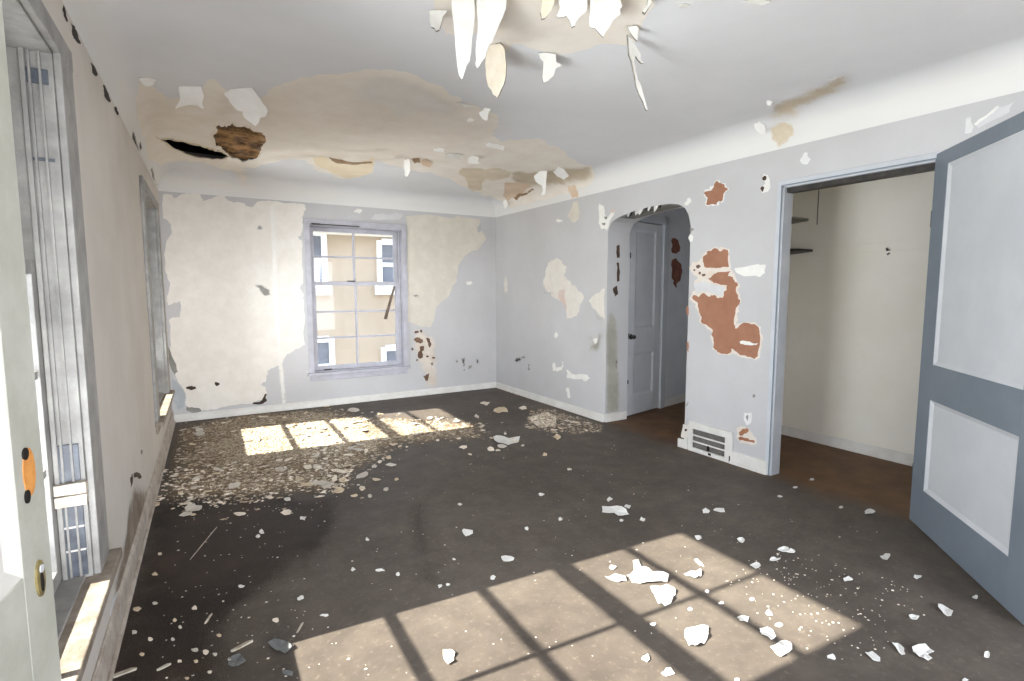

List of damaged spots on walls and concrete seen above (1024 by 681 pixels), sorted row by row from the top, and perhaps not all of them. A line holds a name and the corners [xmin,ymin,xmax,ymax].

peeling [136,69,595,222]
peeling [429,0,656,111]
flaking render [703,180,729,206]
water stain [754,74,852,148]
peeling [162,193,306,413]
peeling [354,208,486,389]
peeling [543,245,620,321]
flaking render [671,228,763,360]